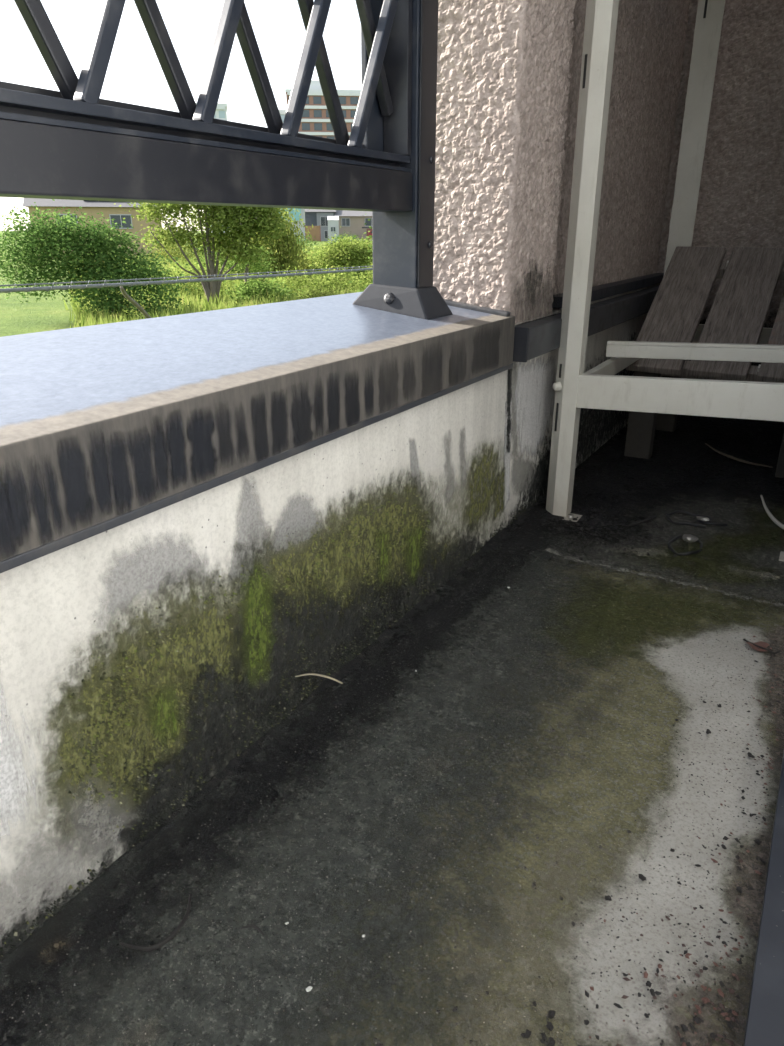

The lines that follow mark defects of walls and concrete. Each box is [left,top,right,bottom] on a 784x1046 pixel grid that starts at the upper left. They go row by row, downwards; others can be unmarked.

leakage [0,358,784,1046]